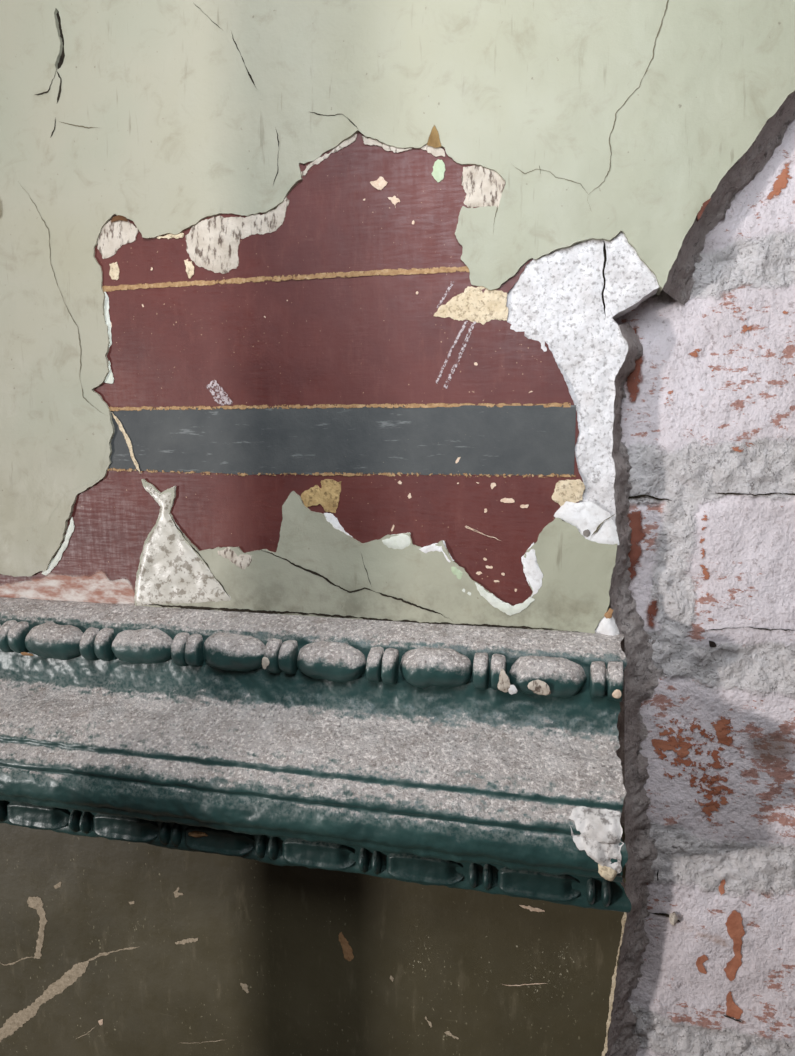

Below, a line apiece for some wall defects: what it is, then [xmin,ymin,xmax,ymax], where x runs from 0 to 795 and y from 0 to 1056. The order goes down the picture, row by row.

crack [35,11,97,138]
crack [515,0,669,212]
crack [20,184,141,474]
peeling [0,132,585,616]
crack [628,494,672,502]
crack [717,490,795,498]
flaking render [506,91,795,1056]
peeling [497,669,551,695]
peeling [1,897,47,965]
peeling [0,946,140,1042]
peeling [338,932,354,961]